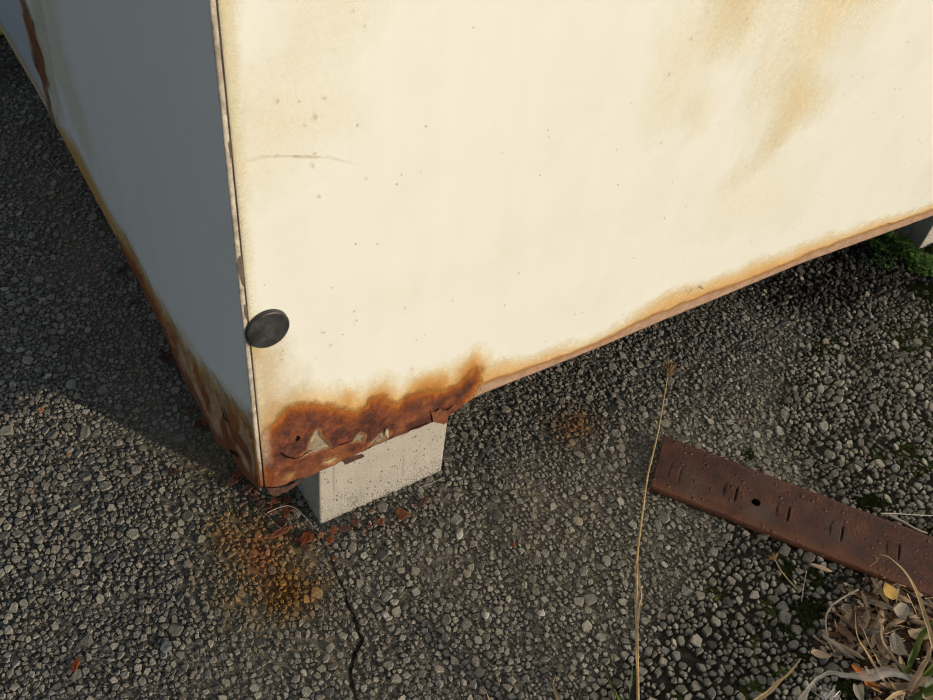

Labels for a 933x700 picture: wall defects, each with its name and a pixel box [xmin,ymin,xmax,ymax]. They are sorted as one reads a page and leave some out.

corrosion [204,489,385,621]
crack [331,560,364,700]